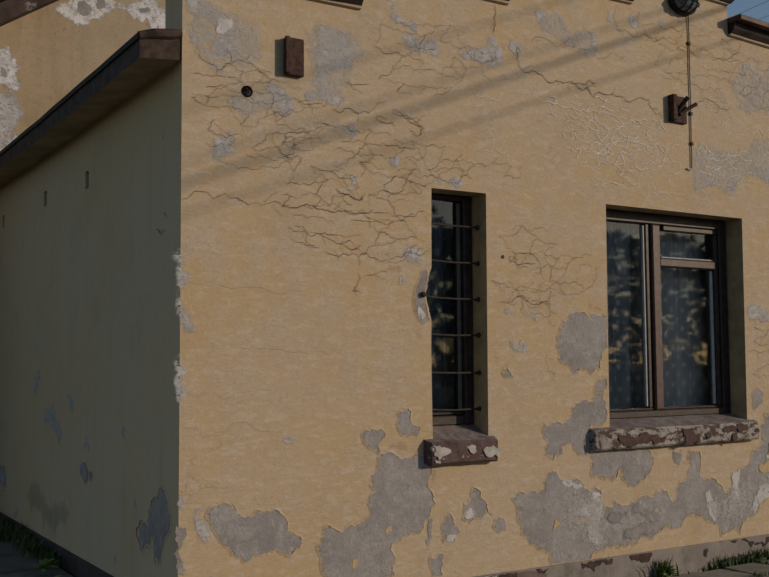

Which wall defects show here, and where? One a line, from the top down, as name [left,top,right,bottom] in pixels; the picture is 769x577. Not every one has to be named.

peeling [54,0,165,29]
peeling [0,46,24,151]
crack [185,5,769,295]
crack [495,225,597,326]
peeling [174,361,187,402]
peeling [315,310,769,577]
peeling [136,484,304,576]